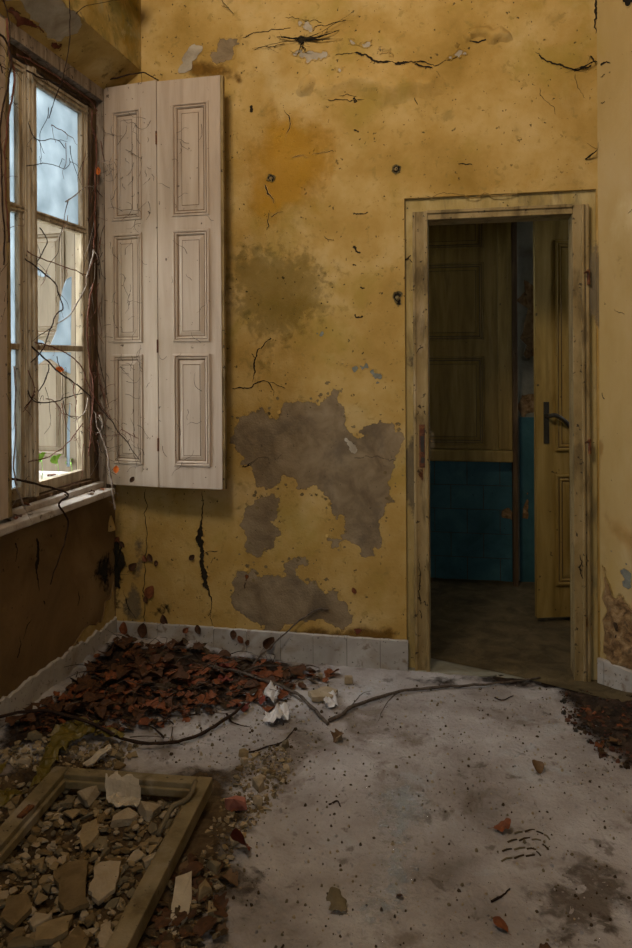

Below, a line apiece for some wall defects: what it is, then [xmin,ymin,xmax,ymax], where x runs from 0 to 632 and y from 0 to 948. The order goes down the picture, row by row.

peeling [1,0,84,44]
crack [242,16,345,50]
crack [335,28,487,77]
crack [535,52,611,104]
peeling [224,381,406,635]
crack [194,490,218,625]
spalling [601,551,632,670]